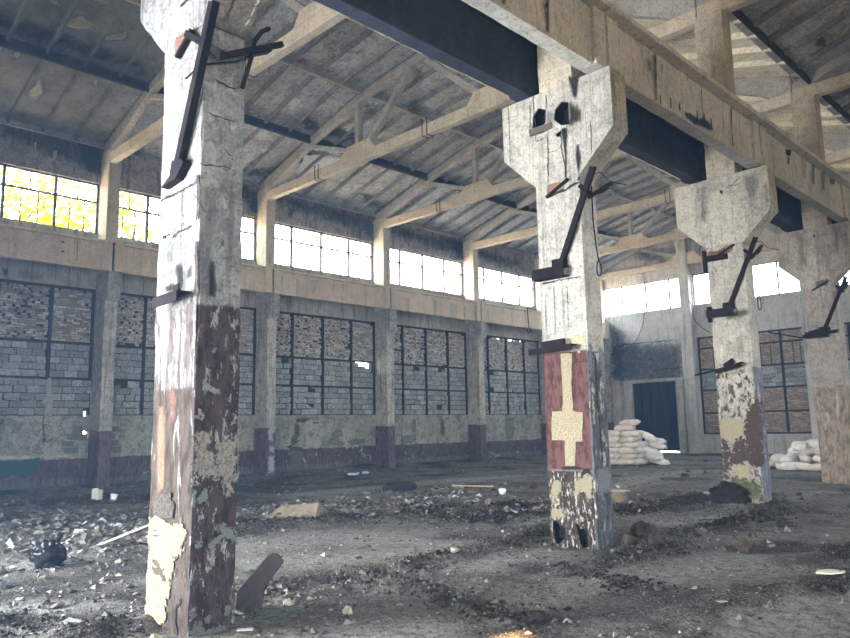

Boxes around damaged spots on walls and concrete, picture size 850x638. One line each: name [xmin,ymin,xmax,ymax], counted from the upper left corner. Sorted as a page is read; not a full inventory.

peeling [189,408,241,505]
peeling [550,334,612,547]
peeling [720,400,766,481]
peeling [144,492,239,625]
peeling [188,603,234,636]